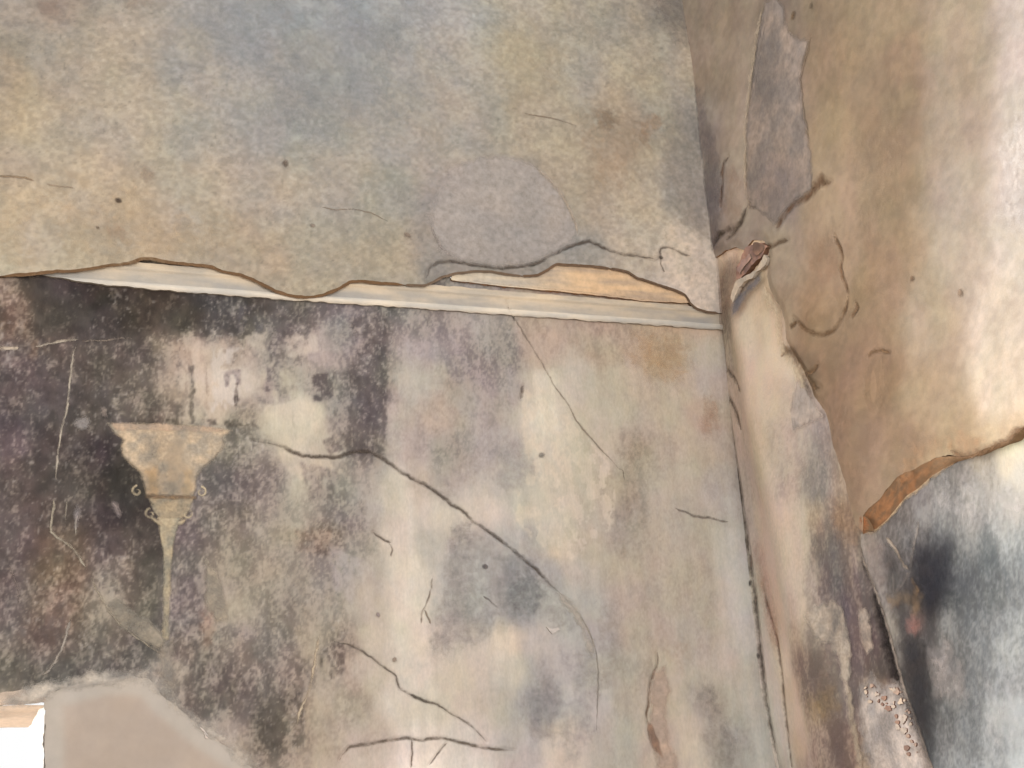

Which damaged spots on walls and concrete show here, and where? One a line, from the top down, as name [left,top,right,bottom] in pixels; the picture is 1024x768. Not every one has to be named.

flaking render [744,0,812,223]
flaking render [450,265,689,303]
flaking render [731,242,771,302]
crack [3,240,717,452]
peeling [790,367,822,429]
crack [286,449,544,578]
flaking render [861,456,973,534]
flaking render [0,672,252,768]
crack [297,641,318,723]
crack [343,643,502,766]
crack [581,618,599,707]
leakage [903,642,928,730]